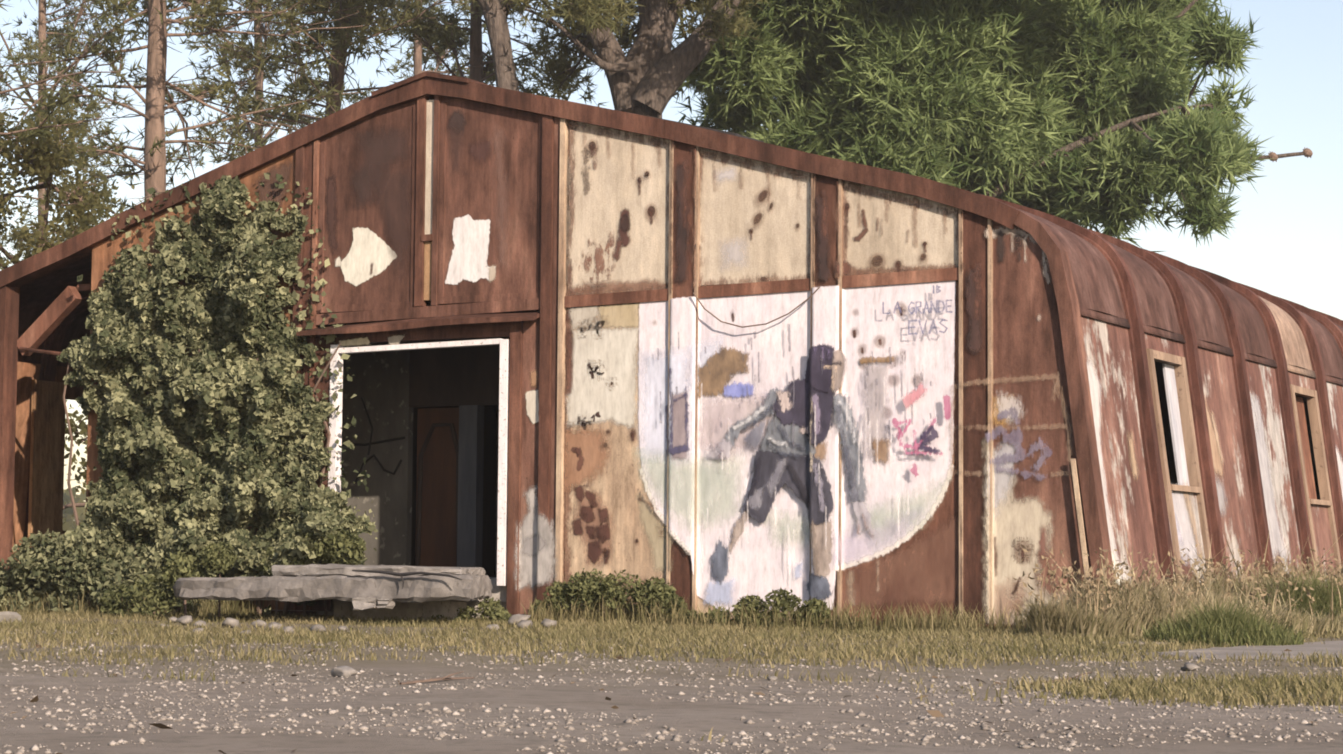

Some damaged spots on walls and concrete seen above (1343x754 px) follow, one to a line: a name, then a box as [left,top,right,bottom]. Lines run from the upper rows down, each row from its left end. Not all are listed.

rust [325,175,338,252]
rust [563,121,964,584]
peeling [984,444,1064,625]
peeling [1087,361,1126,585]
peeling [1129,432,1137,475]
peeling [1169,484,1203,561]
peeling [1205,403,1225,513]
peeling [1251,397,1287,559]